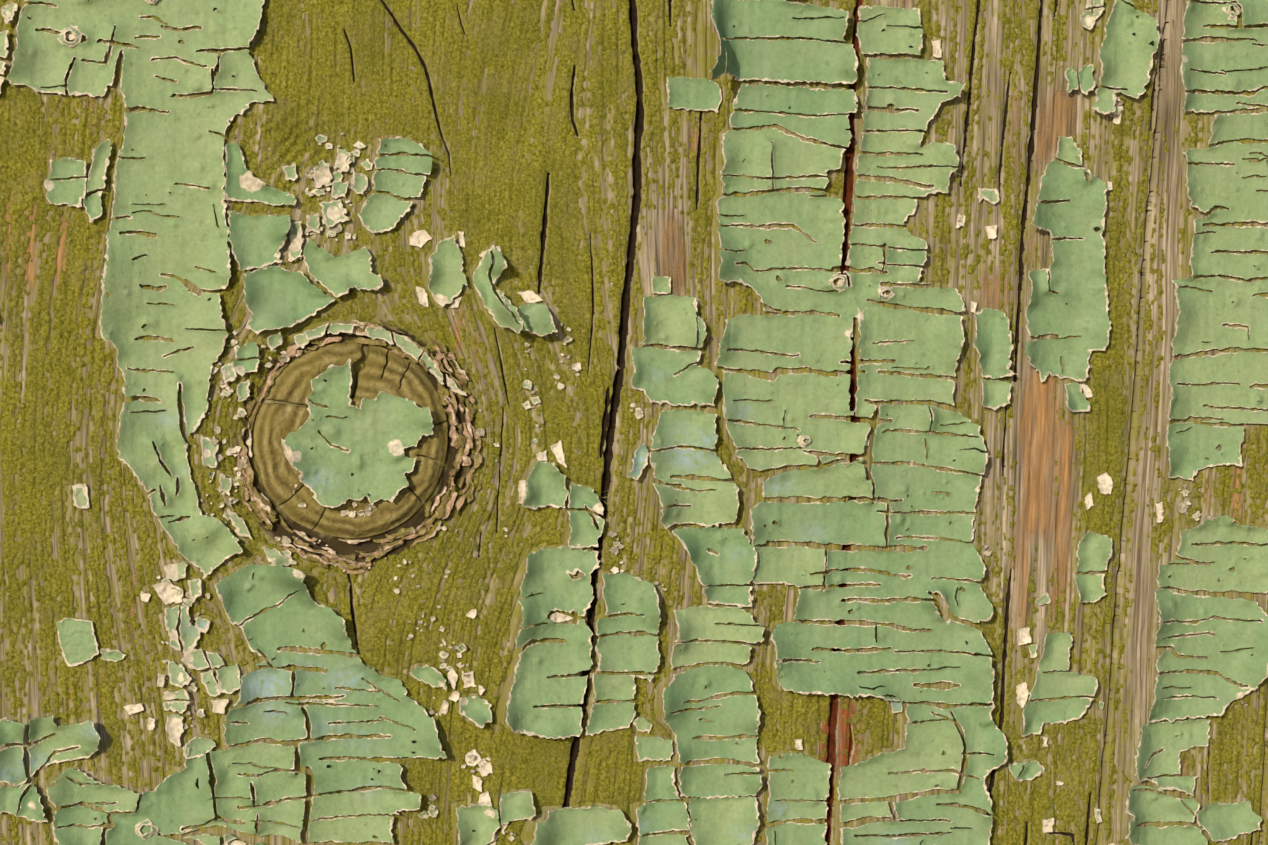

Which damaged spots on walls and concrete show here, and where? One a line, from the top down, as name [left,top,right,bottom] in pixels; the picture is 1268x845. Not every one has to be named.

crack [380,0,451,176]
crack [840,0,863,287]
peeling [1064,0,1160,124]
peeling [0,0,492,845]
peeling [409,230,582,410]
crack [562,0,644,808]
peeling [455,0,1113,845]
crack [846,337,860,423]
crack [849,453,859,501]
peeling [1108,0,1268,845]
crack [833,544,851,652]
crack [825,694,853,845]